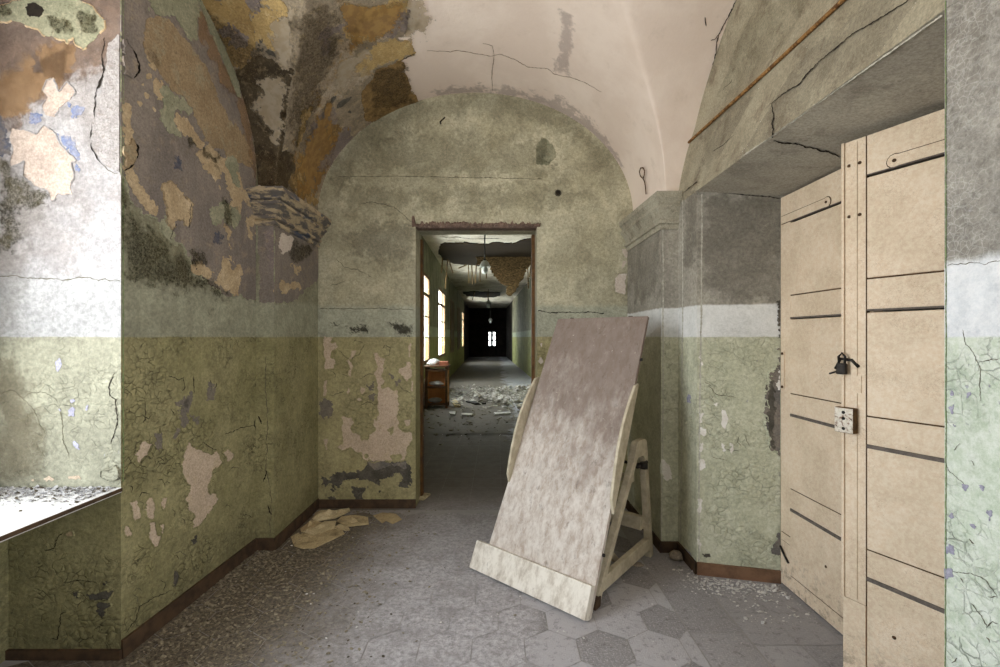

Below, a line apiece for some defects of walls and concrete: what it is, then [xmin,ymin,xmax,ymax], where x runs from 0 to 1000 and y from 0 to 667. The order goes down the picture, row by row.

peeling [0,77,85,202]
peeling [0,0,106,51]
crack [90,39,117,174]
peeling [120,0,319,305]
crack [768,0,908,157]
crack [3,390,69,455]
crack [108,374,118,442]
peeling [134,391,234,546]
peeling [319,335,415,499]
flaking render [763,300,781,456]
crack [963,334,998,398]
crack [953,571,997,643]